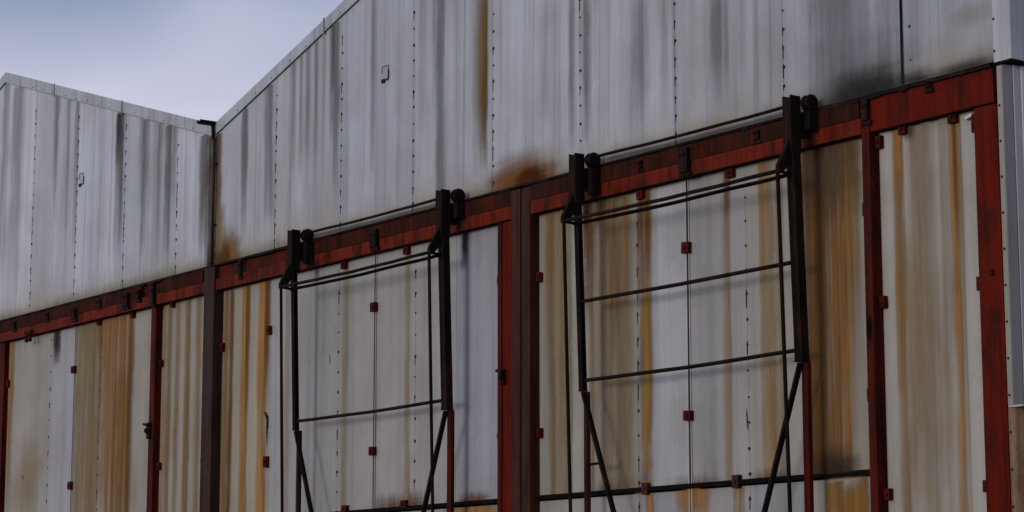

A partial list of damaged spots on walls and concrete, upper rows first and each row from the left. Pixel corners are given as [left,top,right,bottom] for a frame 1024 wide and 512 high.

corrosion [207,133,237,265]
corrosion [477,0,486,122]
corrosion [495,160,554,190]
leakage [835,72,925,102]
corrosion [102,314,132,512]
corrosion [220,280,269,512]
corrosion [637,189,653,512]
corrosion [801,140,868,512]
corrosion [893,126,912,512]
corrosion [948,123,965,512]